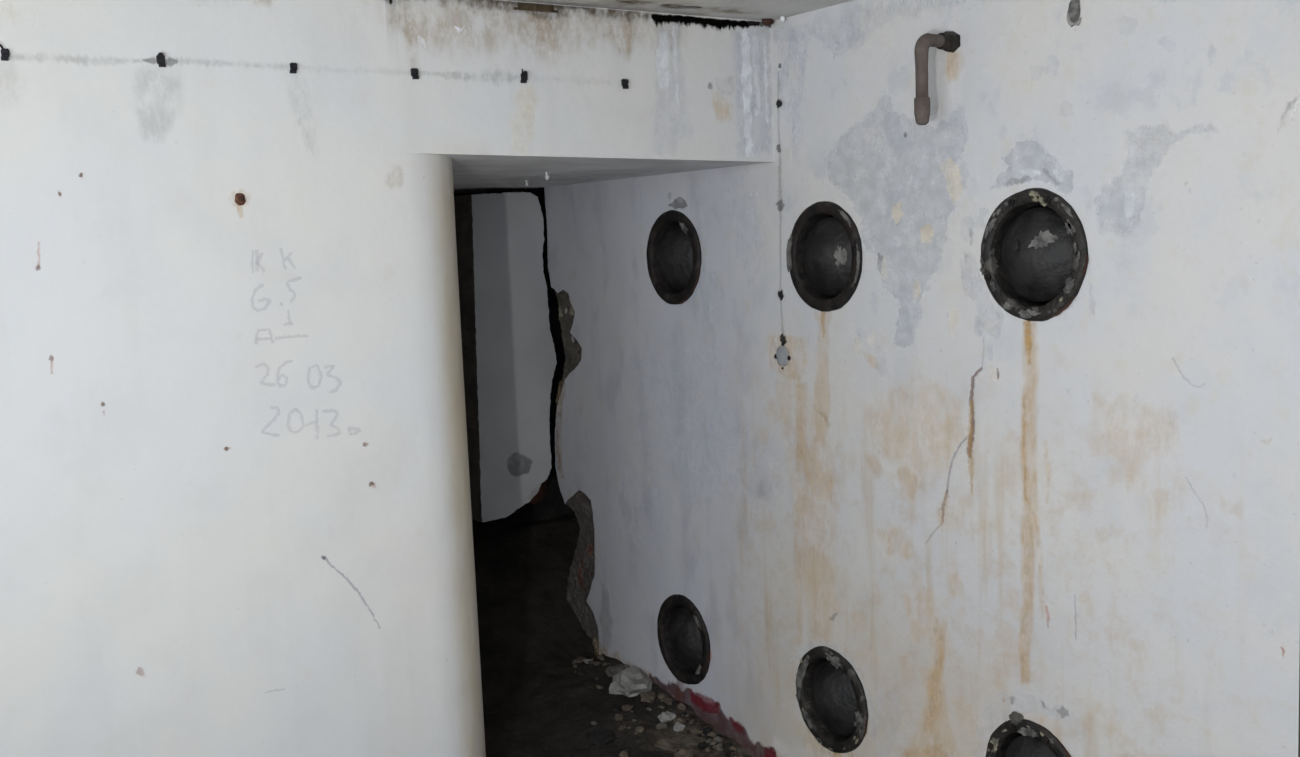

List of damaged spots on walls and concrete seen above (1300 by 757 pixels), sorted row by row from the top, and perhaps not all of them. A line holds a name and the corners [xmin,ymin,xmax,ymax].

peeling [834,244,860,286]
spalling [555,290,582,398]
spalling [565,490,599,655]